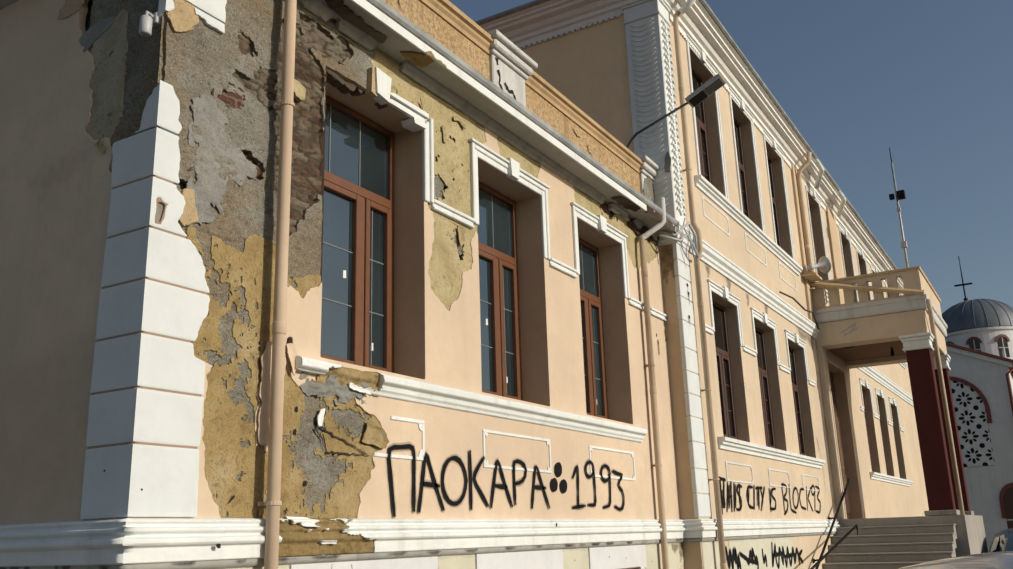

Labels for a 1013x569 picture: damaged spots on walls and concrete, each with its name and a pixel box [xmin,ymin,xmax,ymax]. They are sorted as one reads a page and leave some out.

crack [495,57,516,100]
flaking render [573,186,658,269]
flaking render [57,0,540,544]